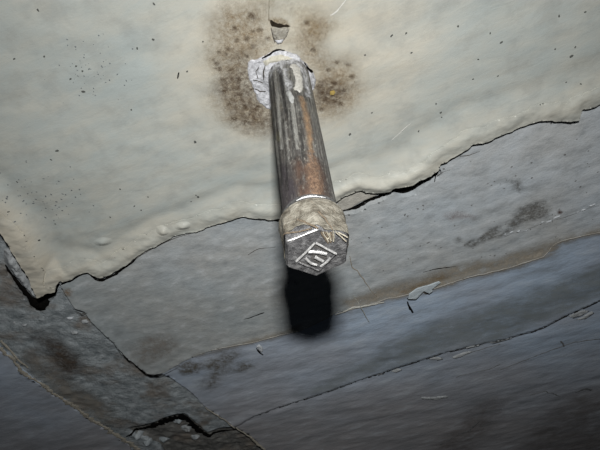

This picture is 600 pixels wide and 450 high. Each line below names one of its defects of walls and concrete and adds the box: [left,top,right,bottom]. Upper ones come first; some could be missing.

rust [215,12,260,123]
rust [296,96,324,196]
rust [317,68,352,110]
peeling [333,87,600,210]
spalling [468,203,600,246]
flaking render [0,201,282,450]
peeling [210,232,600,355]
crack [259,300,600,415]